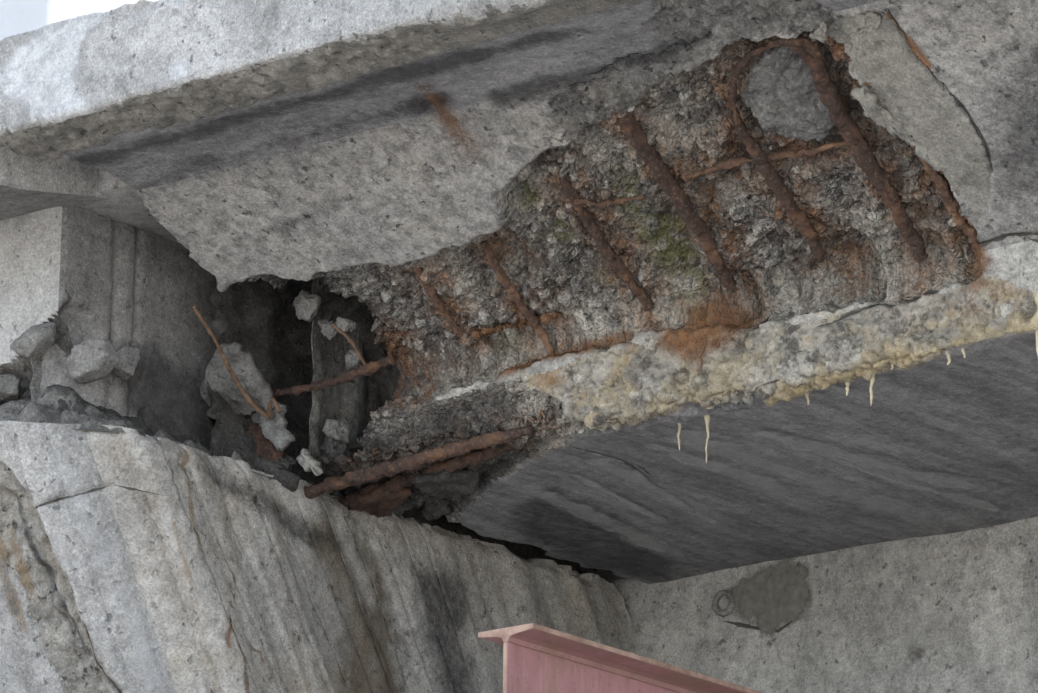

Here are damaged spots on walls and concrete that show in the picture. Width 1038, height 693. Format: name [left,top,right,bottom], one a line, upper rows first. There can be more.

water stain [78,30,591,165]
crack [928,67,991,163]
spalling [200,0,1038,540]
crack [979,233,1038,246]
spalling [0,297,212,456]
rust [498,335,627,375]
rust [658,305,757,361]
water stain [767,291,1038,407]
crack [35,485,166,508]
crack [87,631,121,693]